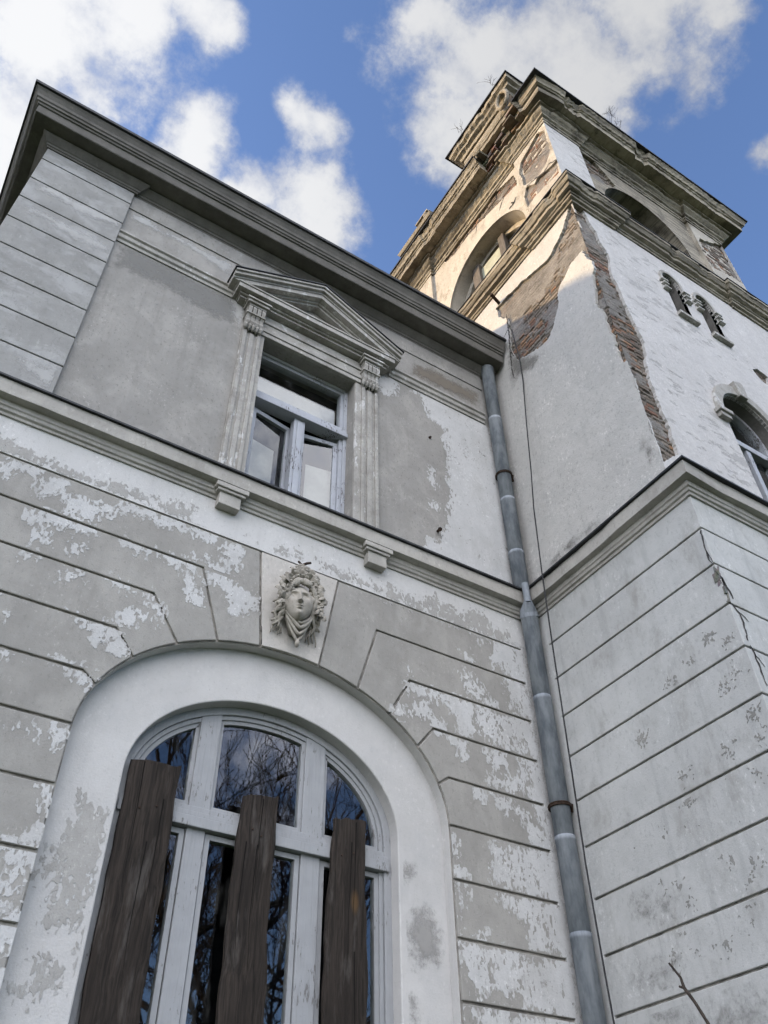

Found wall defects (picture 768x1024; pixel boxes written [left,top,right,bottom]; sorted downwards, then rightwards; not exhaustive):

spalling [446,132,559,262]
spalling [498,207,675,462]
spalling [699,240,740,282]
peeling [47,652,101,693]
peeling [0,432,261,658]
peeling [378,375,513,584]
crack [700,530,768,686]
peeling [273,544,582,1024]
peeling [0,775,111,1017]